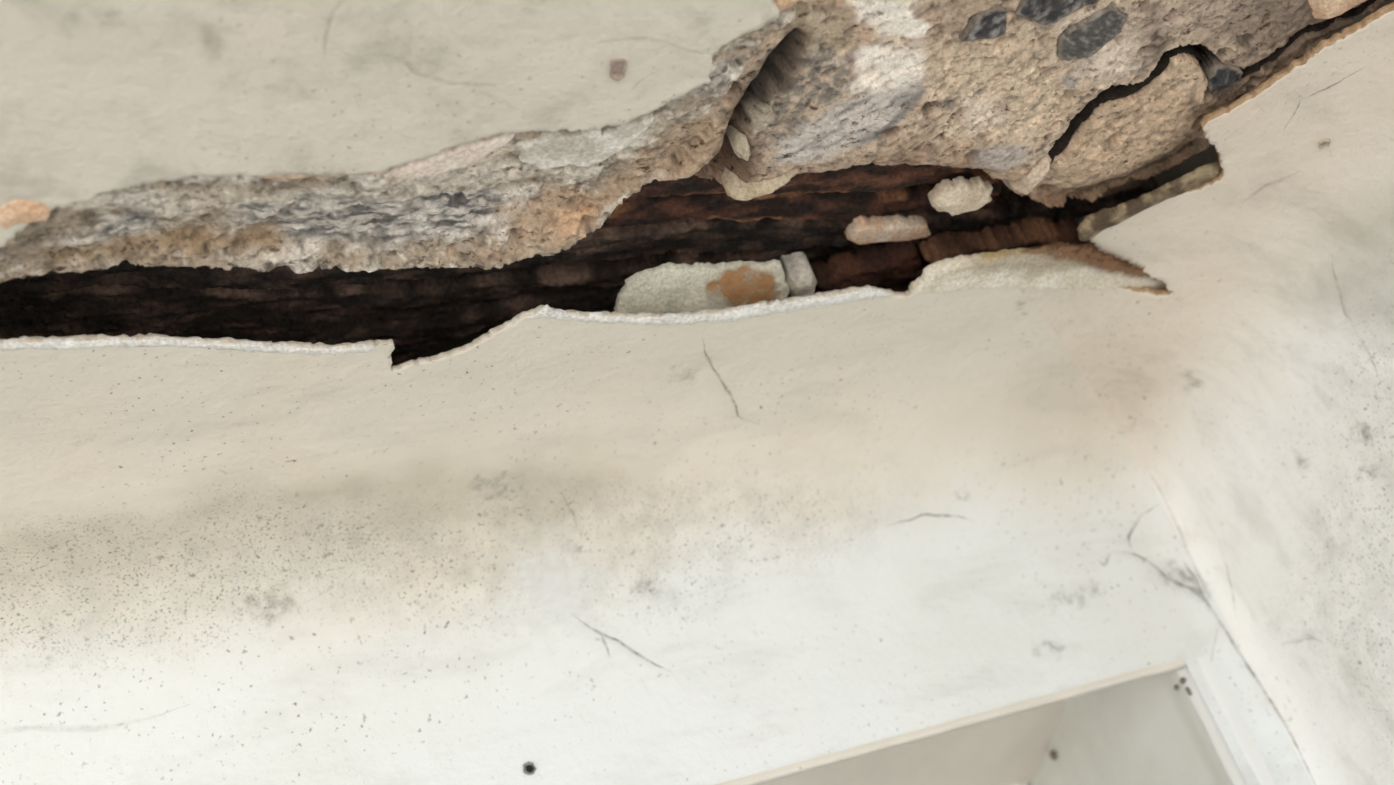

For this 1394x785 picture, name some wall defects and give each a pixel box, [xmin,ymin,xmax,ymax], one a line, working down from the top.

crack [1048,0,1376,164]
spalling [0,0,1387,283]
peeling [537,305,554,318]
peeling [660,313,680,324]
peeling [767,299,783,313]
flaking render [908,248,1166,293]
crack [703,342,738,416]
leakage [1,523,344,639]
crack [1105,530,1310,774]